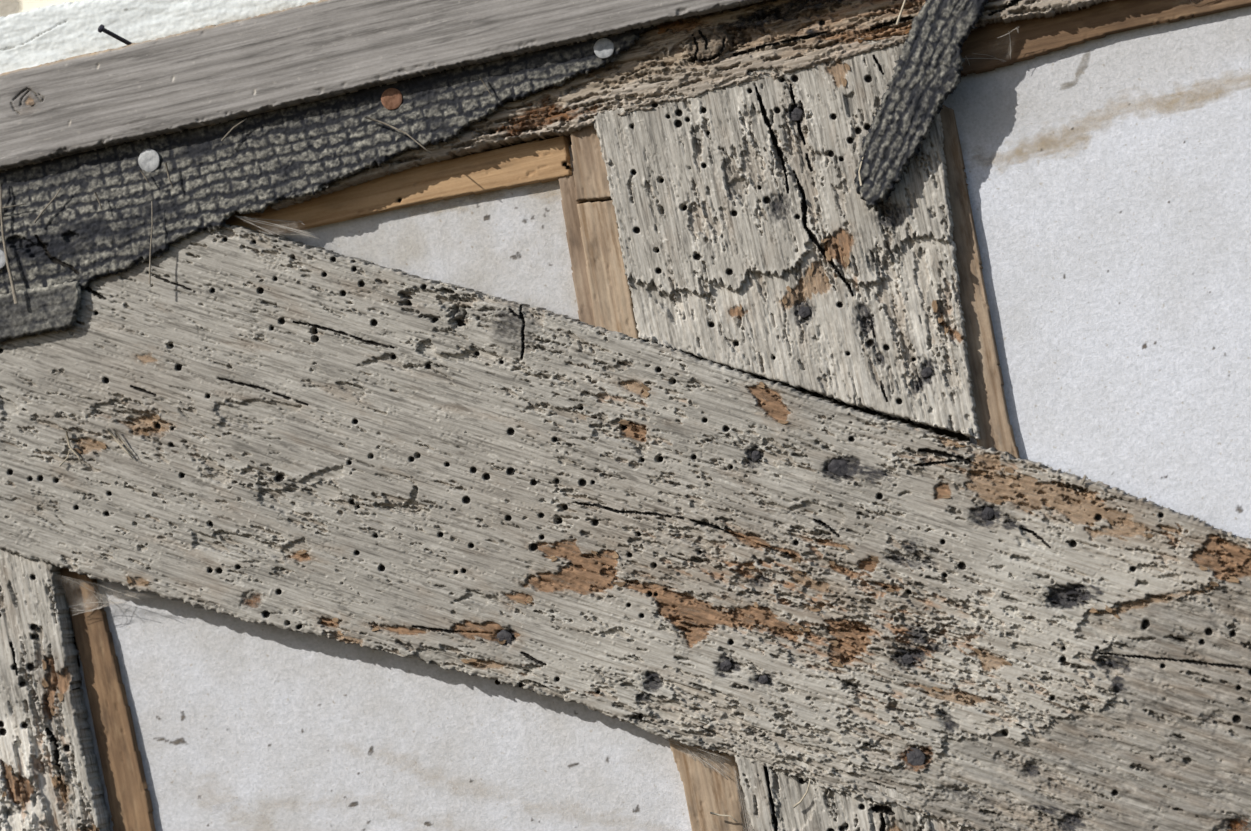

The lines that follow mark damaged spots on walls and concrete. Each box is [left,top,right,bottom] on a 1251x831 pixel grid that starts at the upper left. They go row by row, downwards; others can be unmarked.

crack [690,30,827,63]
crack [865,16,913,75]
crack [755,83,876,338]
crack [880,380,888,402]
peeling [505,539,811,648]
peeling [727,530,902,668]
peeling [1089,535,1251,619]
crack [763,766,778,831]